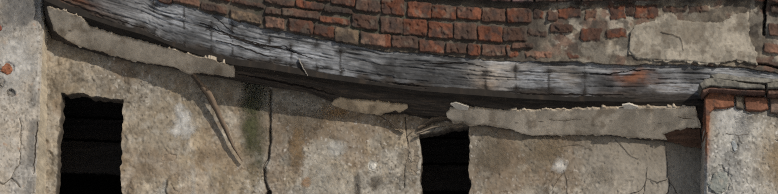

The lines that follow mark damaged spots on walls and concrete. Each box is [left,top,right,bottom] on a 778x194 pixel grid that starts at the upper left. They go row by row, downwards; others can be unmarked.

crack [0,118,39,188]
crack [263,96,271,194]
crack [616,140,677,194]
spalling [665,127,702,149]